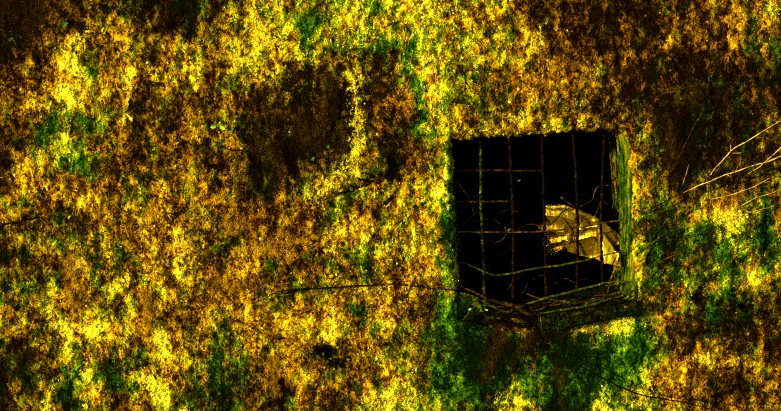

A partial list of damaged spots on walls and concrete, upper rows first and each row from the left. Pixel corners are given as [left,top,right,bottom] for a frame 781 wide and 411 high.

damp [244,46,419,188]